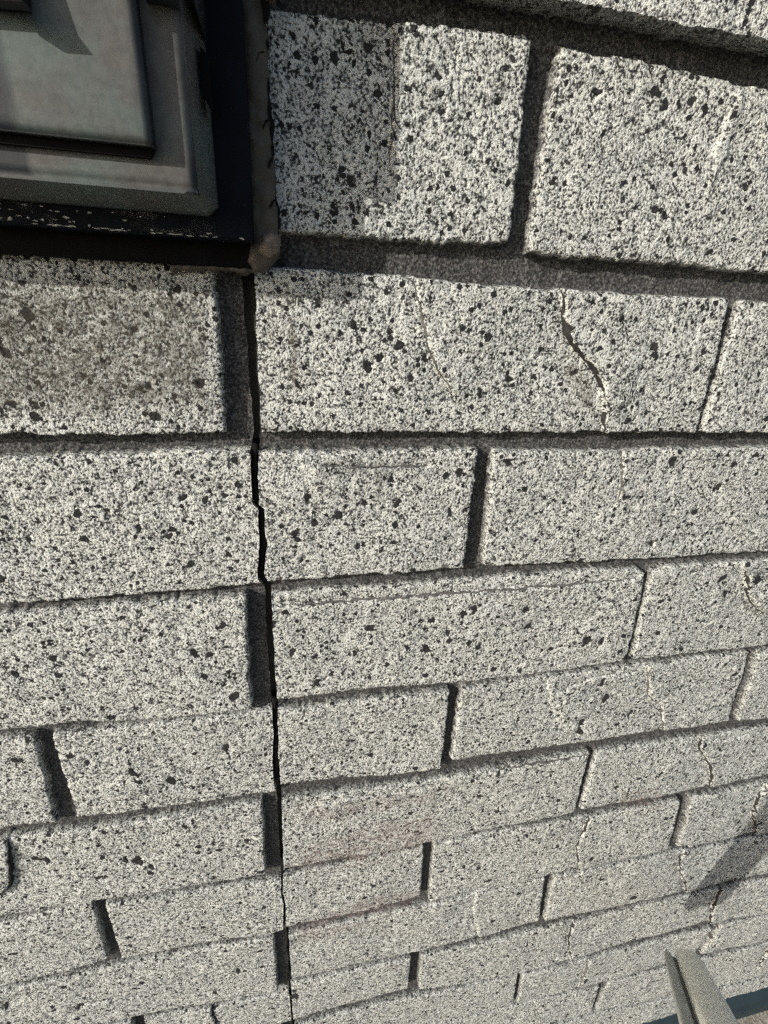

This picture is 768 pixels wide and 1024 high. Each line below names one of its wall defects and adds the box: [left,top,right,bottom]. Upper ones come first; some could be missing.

crack [242,273,640,1024]
crack [646,667,664,731]
crack [694,730,717,787]
crack [751,787,768,833]